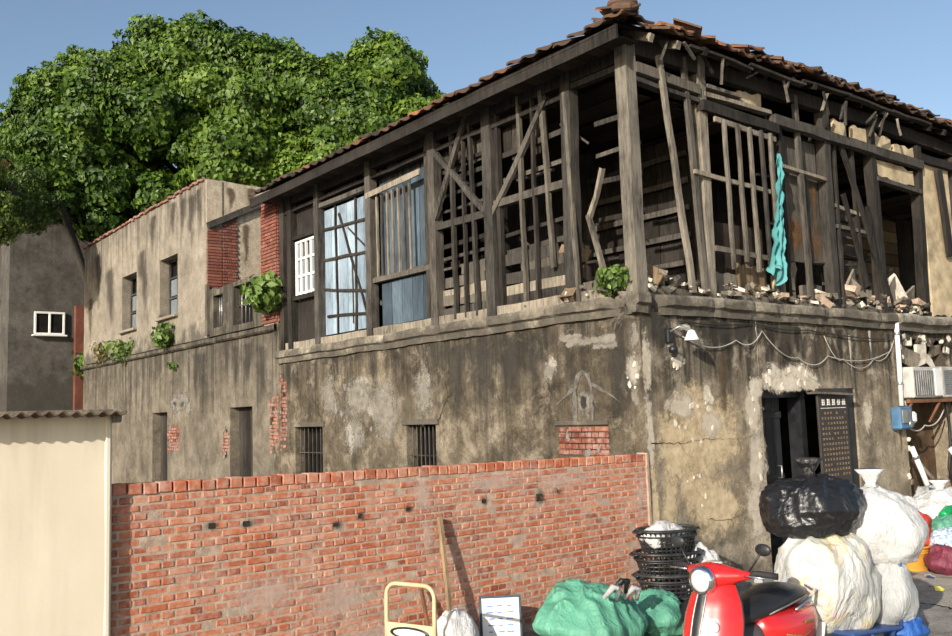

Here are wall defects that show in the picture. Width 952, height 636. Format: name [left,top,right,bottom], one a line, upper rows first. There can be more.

water stain [171,190,201,230]
water stain [96,256,112,312]
flaking render [559,333,617,350]
flaking render [543,355,557,380]
flaking render [558,426,609,457]
flaking render [625,323,821,542]